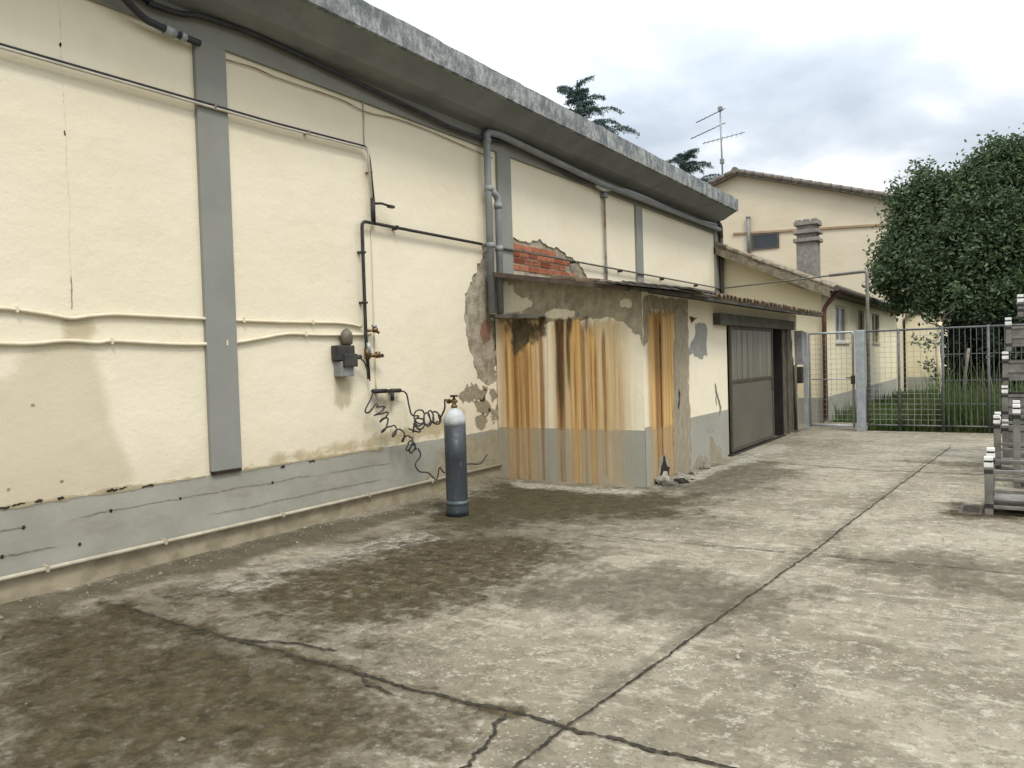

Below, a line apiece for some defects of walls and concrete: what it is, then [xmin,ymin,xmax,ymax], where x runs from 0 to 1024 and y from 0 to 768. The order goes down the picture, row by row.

crack [59,20,73,307]
crack [73,462,393,520]
peeling [428,455,446,489]
corrosion [500,317,623,483]
flaking render [459,238,722,483]
corrosion [648,311,675,477]
crack [96,601,737,768]